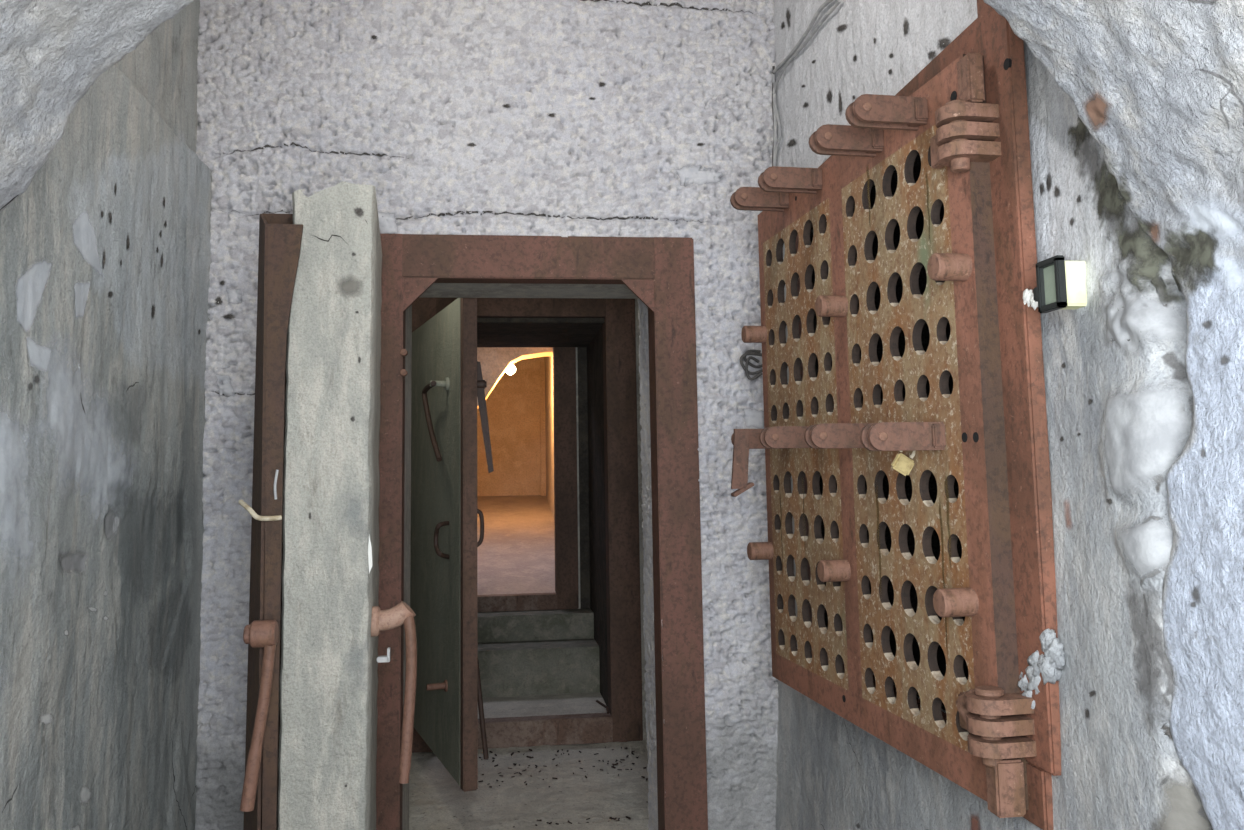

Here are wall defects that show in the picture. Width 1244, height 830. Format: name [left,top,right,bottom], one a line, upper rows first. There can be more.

crack [223,142,408,159]
damp [1068,116,1089,156]
spalling [1073,94,1108,182]
peeling [73,211,130,274]
damp [1095,164,1217,302]
spalling [1101,269,1187,353]
spalling [1163,353,1188,381]
peeling [17,261,131,539]
spalling [1191,588,1200,607]
spalling [1129,594,1174,739]
corrosion [971,816,980,830]
spalling [1181,765,1213,830]